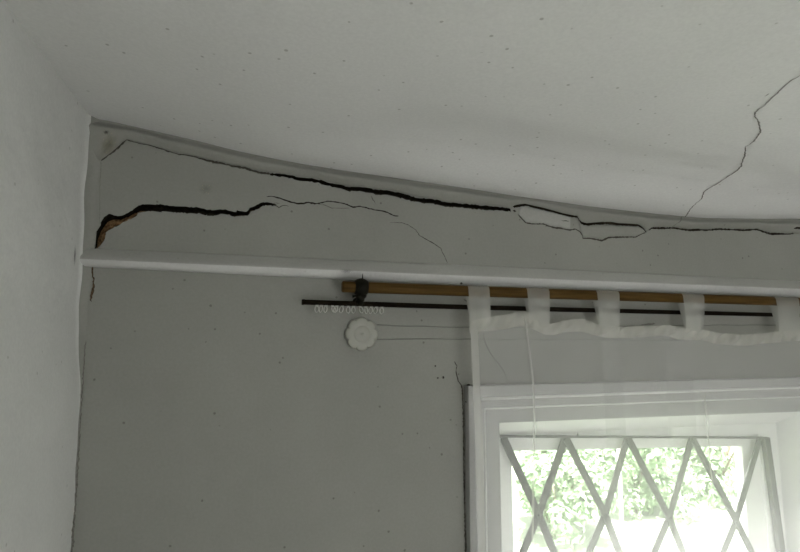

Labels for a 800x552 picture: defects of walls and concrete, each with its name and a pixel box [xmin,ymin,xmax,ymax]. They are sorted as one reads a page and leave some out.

crack [90,76,800,302]